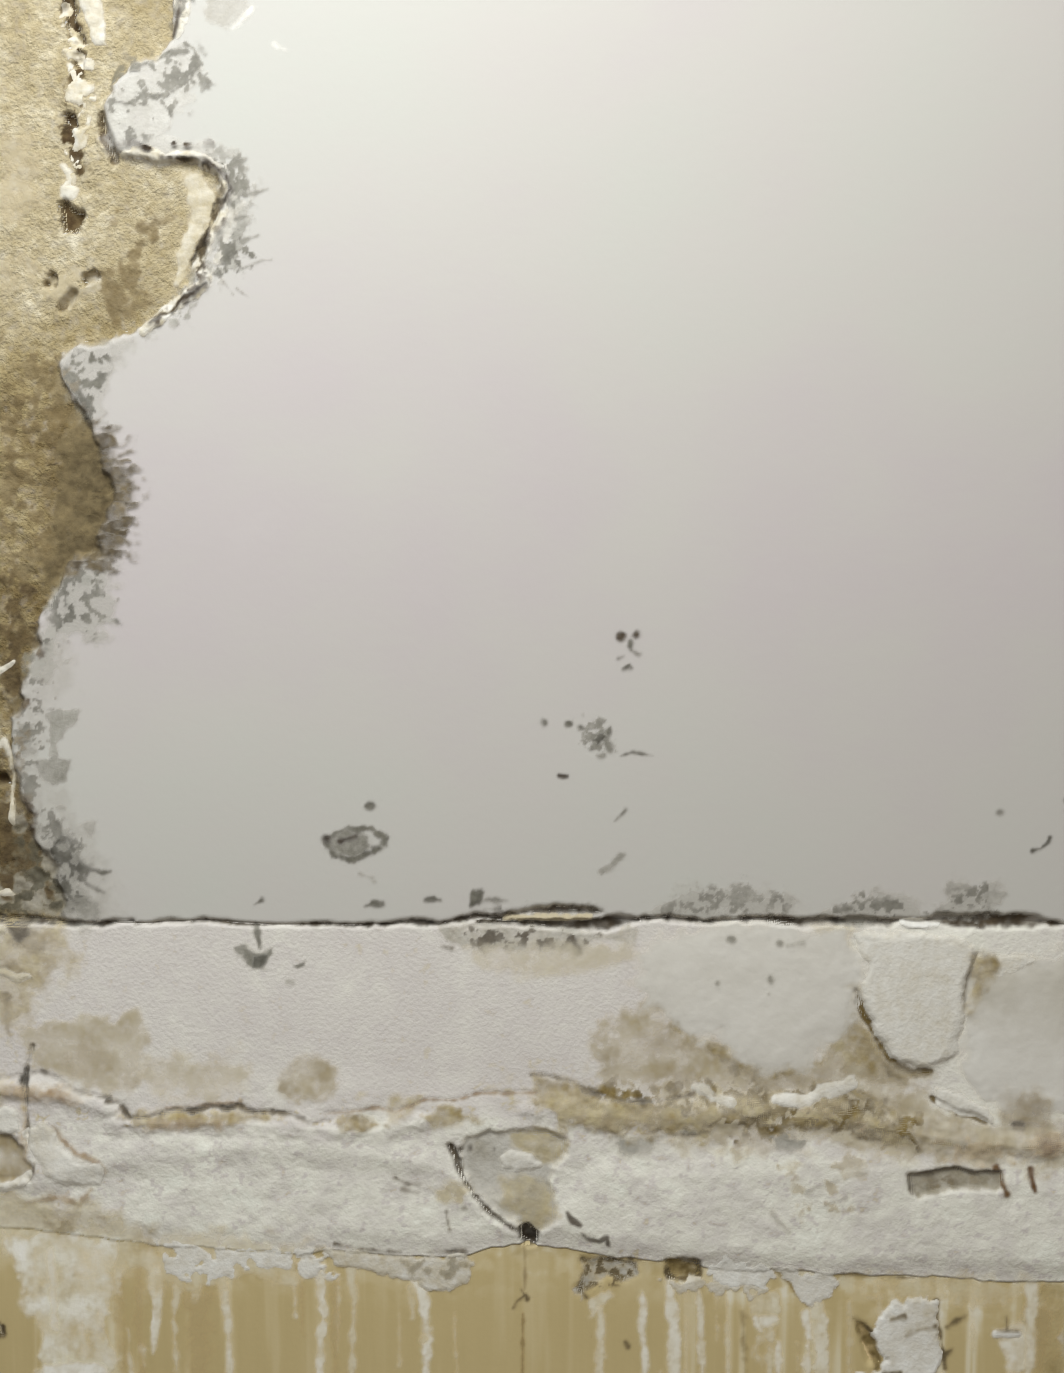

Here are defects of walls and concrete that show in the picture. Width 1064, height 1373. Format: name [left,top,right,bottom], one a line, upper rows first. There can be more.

flaking render [0,0,233,920]
leakage [0,352,139,1021]
crack [0,914,134,927]
crack [298,905,1059,930]
peeling [853,930,1036,1124]
crack [102,1096,303,1119]
leakage [337,985,1061,1210]
crack [395,1143,610,1247]
leakage [0,1198,297,1373]
leakage [665,1276,718,1373]
peeling [658,1255,857,1307]
flaking render [855,1296,962,1373]